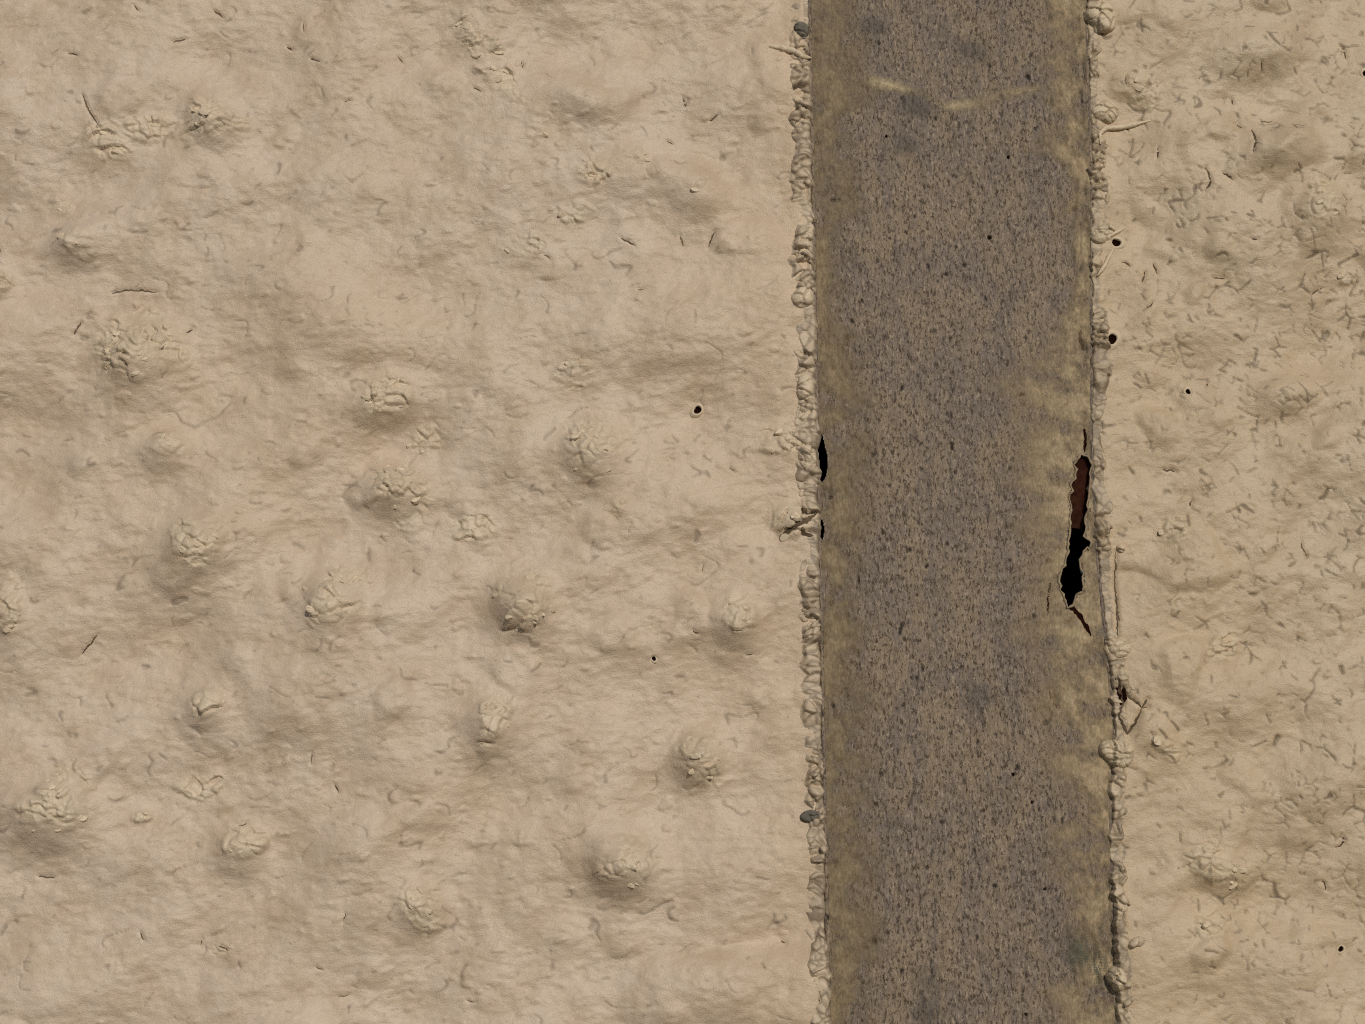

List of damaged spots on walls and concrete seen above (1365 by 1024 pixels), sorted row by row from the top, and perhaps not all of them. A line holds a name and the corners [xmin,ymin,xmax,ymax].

crack [1232,100,1271,151]
crack [1205,169,1233,192]
crack [1113,551,1121,634]
crack [1117,675,1147,734]